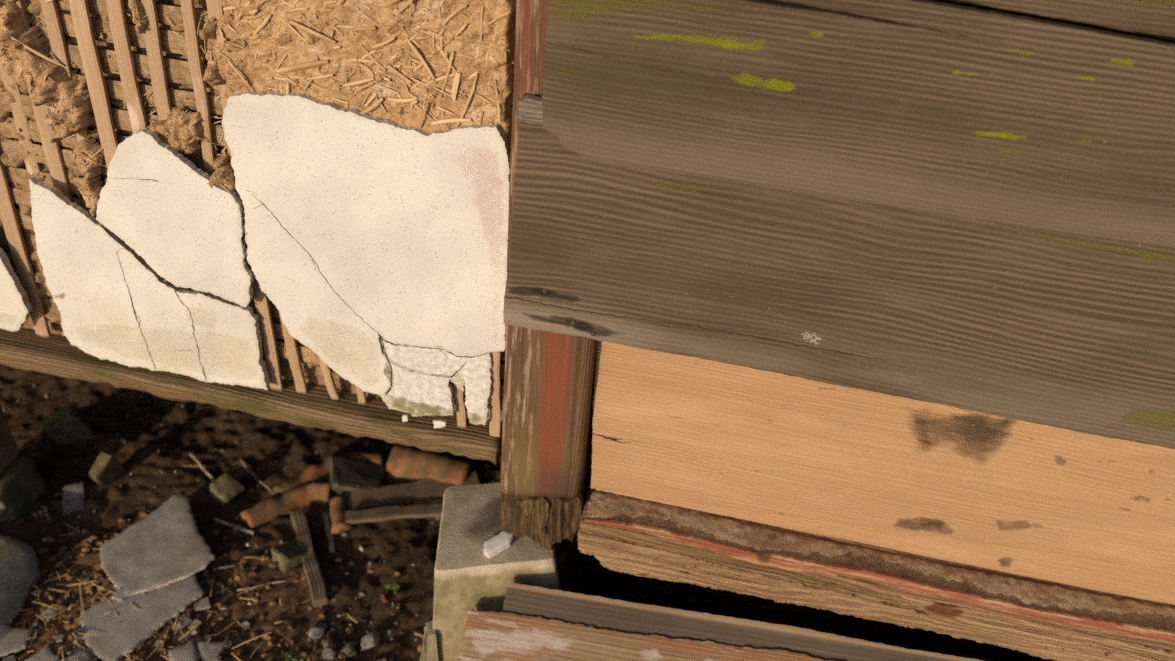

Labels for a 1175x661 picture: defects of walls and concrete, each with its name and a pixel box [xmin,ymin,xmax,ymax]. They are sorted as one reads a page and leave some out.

spalling [0,0,107,216]
spalling [127,0,157,34]
spalling [141,89,239,195]
spalling [197,0,516,153]
crack [98,190,489,395]
peeling [381,336,493,428]